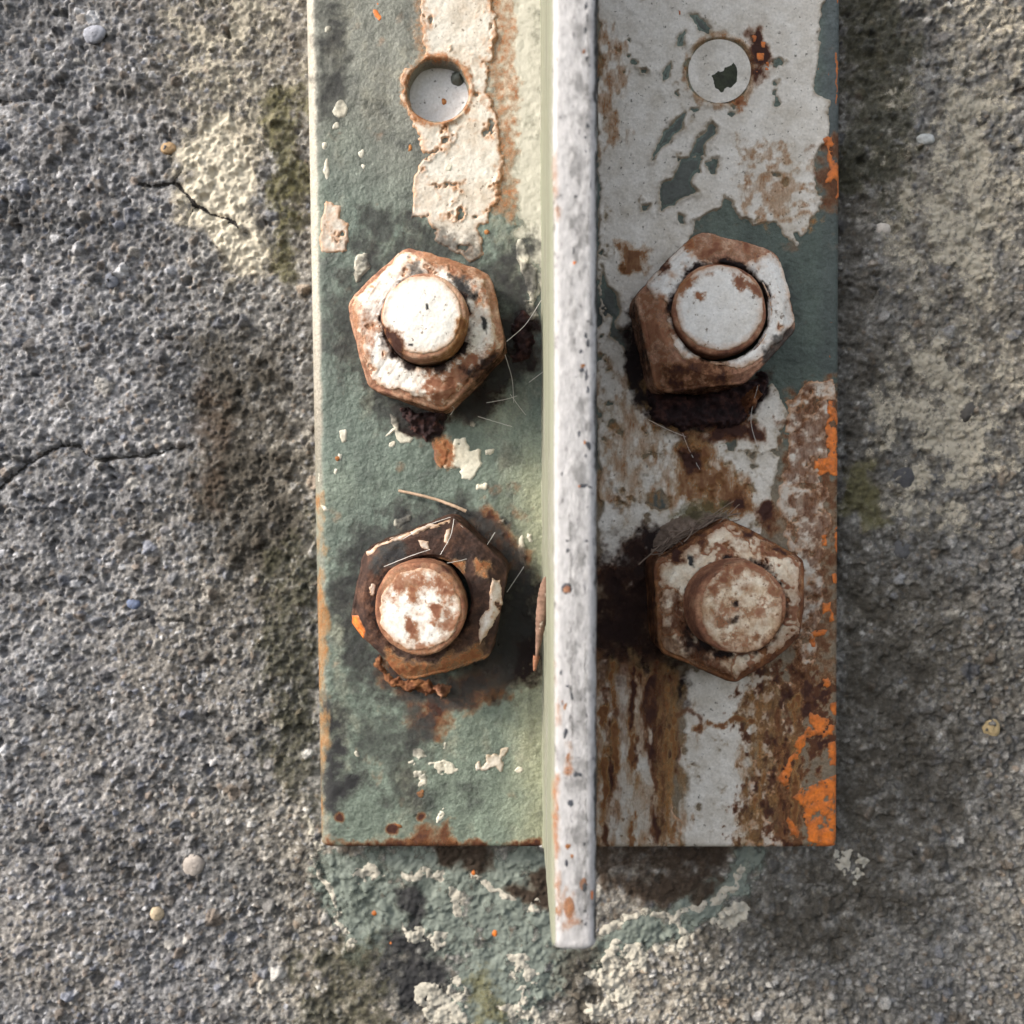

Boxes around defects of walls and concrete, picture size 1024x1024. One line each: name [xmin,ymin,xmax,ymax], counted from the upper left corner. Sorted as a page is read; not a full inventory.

peeling [332,100,348,129]
rust [598,32,627,157]
peeling [322,142,330,179]
crack [138,171,248,234]
peeling [319,201,370,282]
rust [348,252,541,468]
peeling [386,419,413,447]
peeling [400,0,837,944]
rust [596,232,838,847]
rust [365,507,542,741]
rust [325,813,493,877]
rust [504,868,578,926]